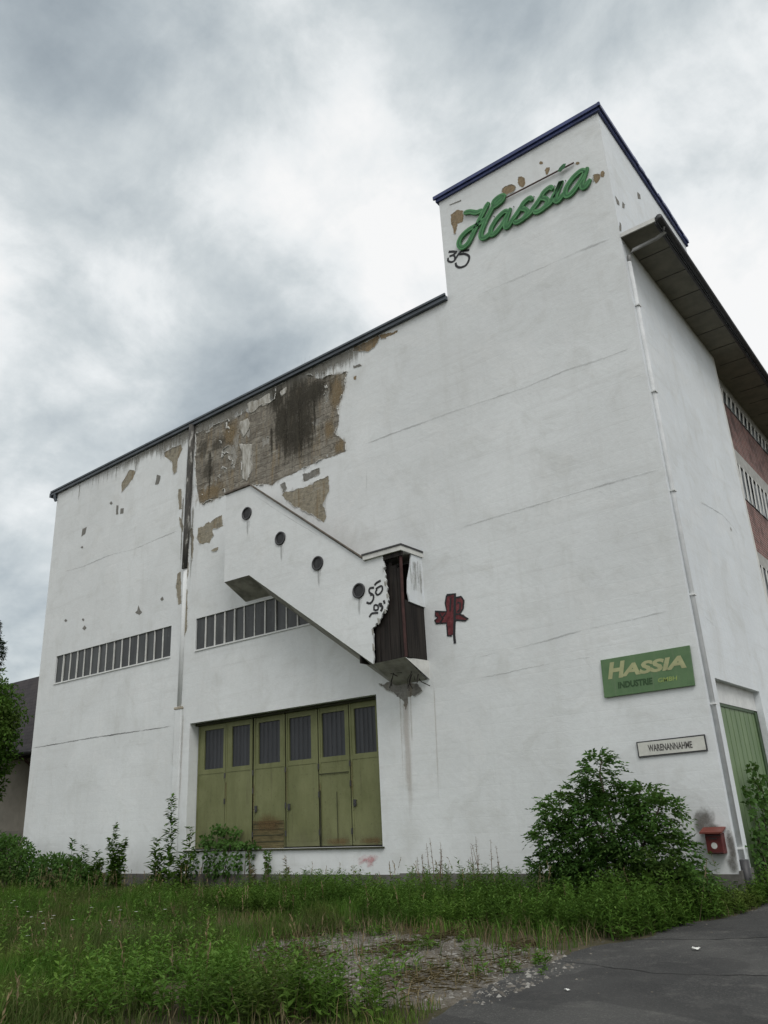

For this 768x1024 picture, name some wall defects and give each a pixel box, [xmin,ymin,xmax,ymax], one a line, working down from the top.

peeling [450,200,464,234]
peeling [501,176,525,195]
peeling [121,469,136,492]
water stain [114,345,361,571]
peeling [155,330,397,523]
peeling [175,489,223,636]